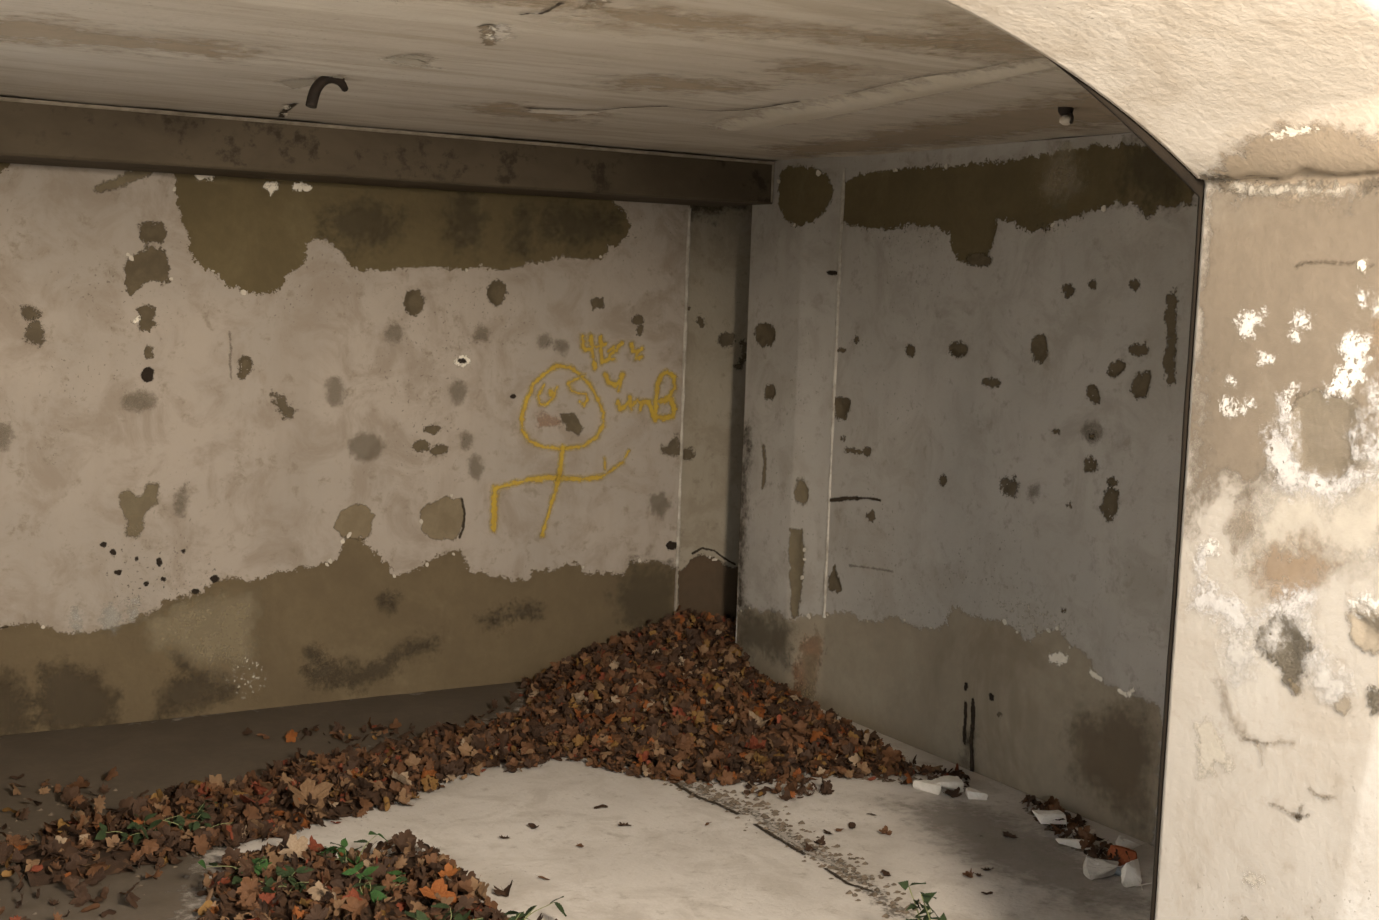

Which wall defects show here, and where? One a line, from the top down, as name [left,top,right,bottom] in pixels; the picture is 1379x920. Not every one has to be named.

spalling [124,221,173,383]
spalling [236,355,254,380]
flaking render [172,173,631,307]
spalling [403,289,427,317]
flaking render [777,121,1379,524]
damp [1233,308,1275,367]
damp [1288,312,1312,343]
damp [1190,331,1379,709]
flaking render [0,494,1162,845]
spalling [1252,612,1315,695]
damp [0,593,528,920]
crack [1270,789,1328,820]